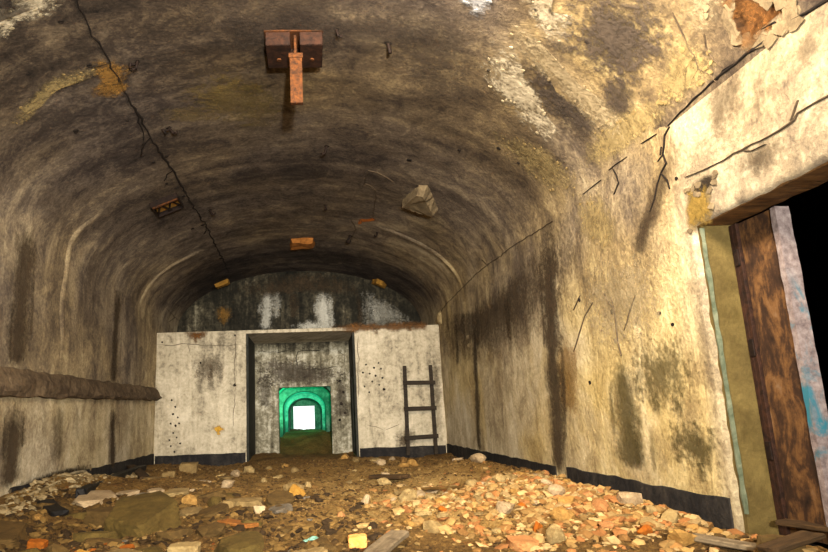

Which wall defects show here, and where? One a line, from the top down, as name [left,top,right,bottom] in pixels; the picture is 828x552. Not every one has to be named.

damp [0,0,29,22]
rust [96,62,130,94]
crack [76,0,228,270]
damp [547,0,672,113]
crack [583,0,828,212]
spalling [721,0,805,51]
damp [9,237,35,362]
damp [256,276,346,329]
damp [445,230,569,471]
damp [615,345,689,466]
damp [669,422,713,473]